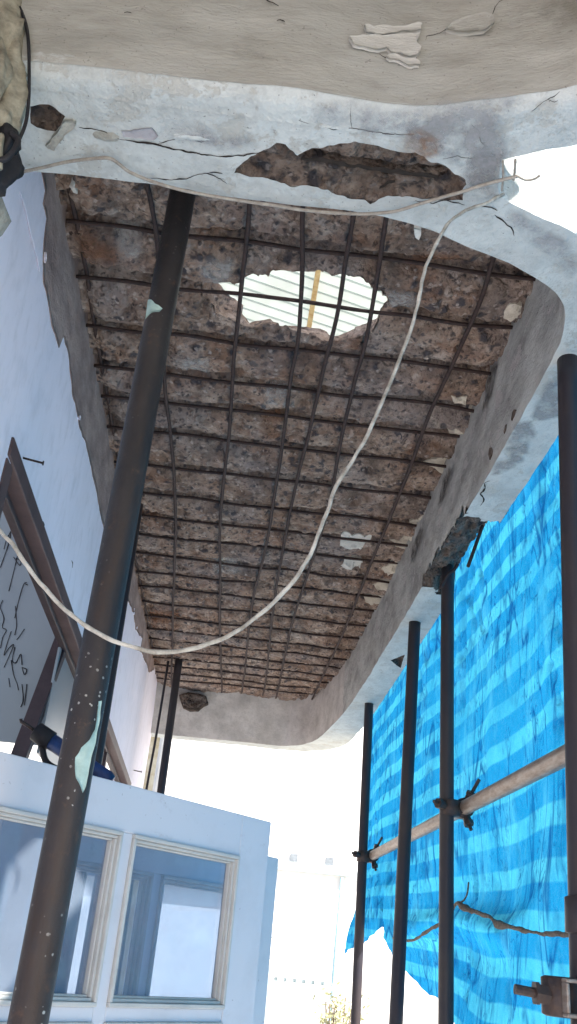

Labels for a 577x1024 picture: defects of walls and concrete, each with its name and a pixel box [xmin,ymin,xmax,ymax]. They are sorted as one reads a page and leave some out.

flaking render [349,22,422,69]
spalling [30,104,76,151]
crack [79,127,261,184]
crack [417,200,514,235]
peeling [41,172,162,528]
spalling [128,141,536,712]